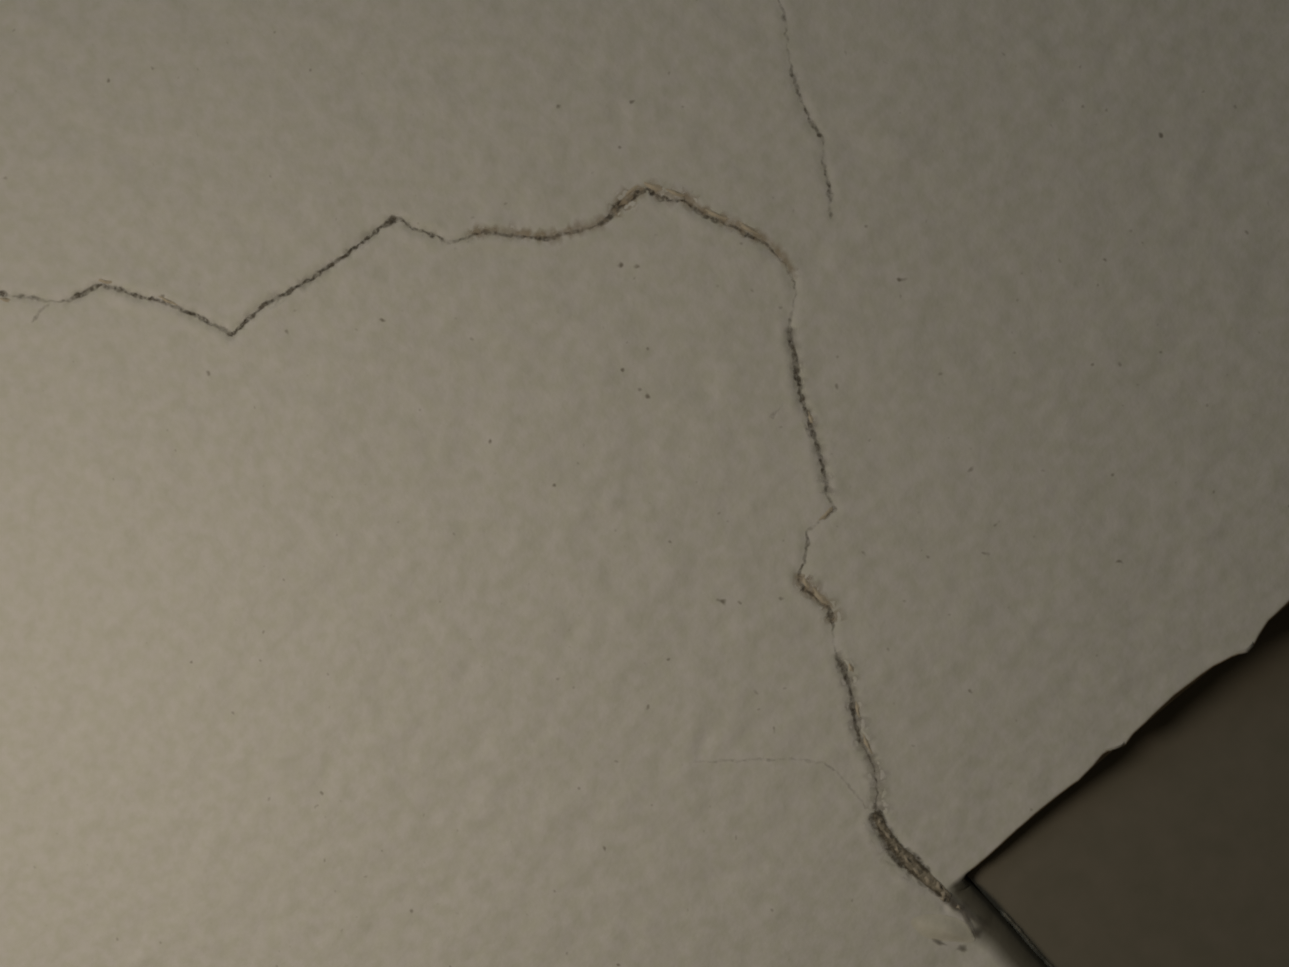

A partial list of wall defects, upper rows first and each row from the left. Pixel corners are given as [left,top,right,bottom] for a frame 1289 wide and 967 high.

crack [75,216,439,336]
crack [472,182,792,269]
crack [788,340,833,520]
crack [797,564,835,620]
crack [838,659,883,810]